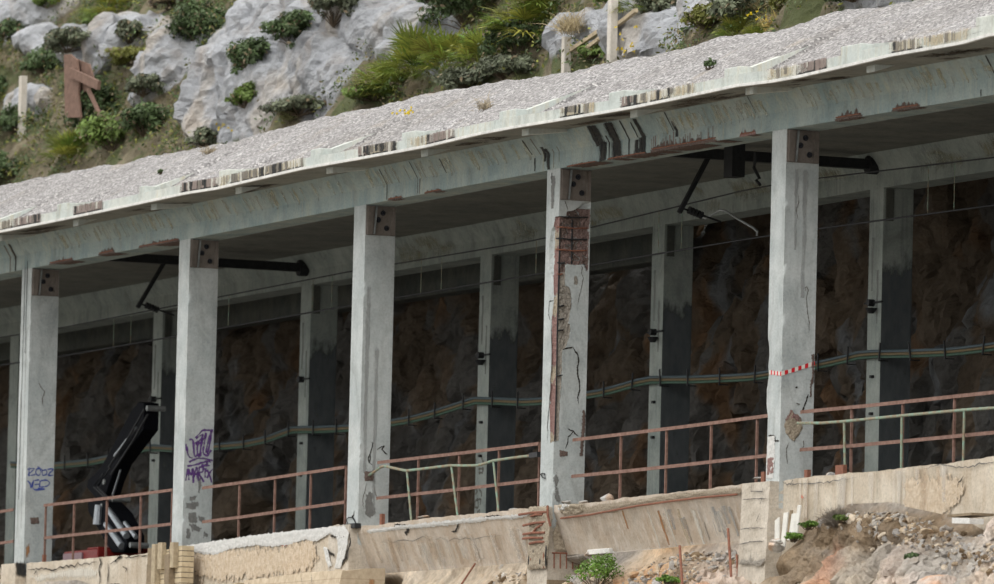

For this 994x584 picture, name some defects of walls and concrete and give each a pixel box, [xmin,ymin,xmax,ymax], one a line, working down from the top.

water stain [481,296,518,513]
crack [547,300,580,449]
spalling [550,209,590,457]
spalling [766,410,803,479]
water stain [871,247,912,471]